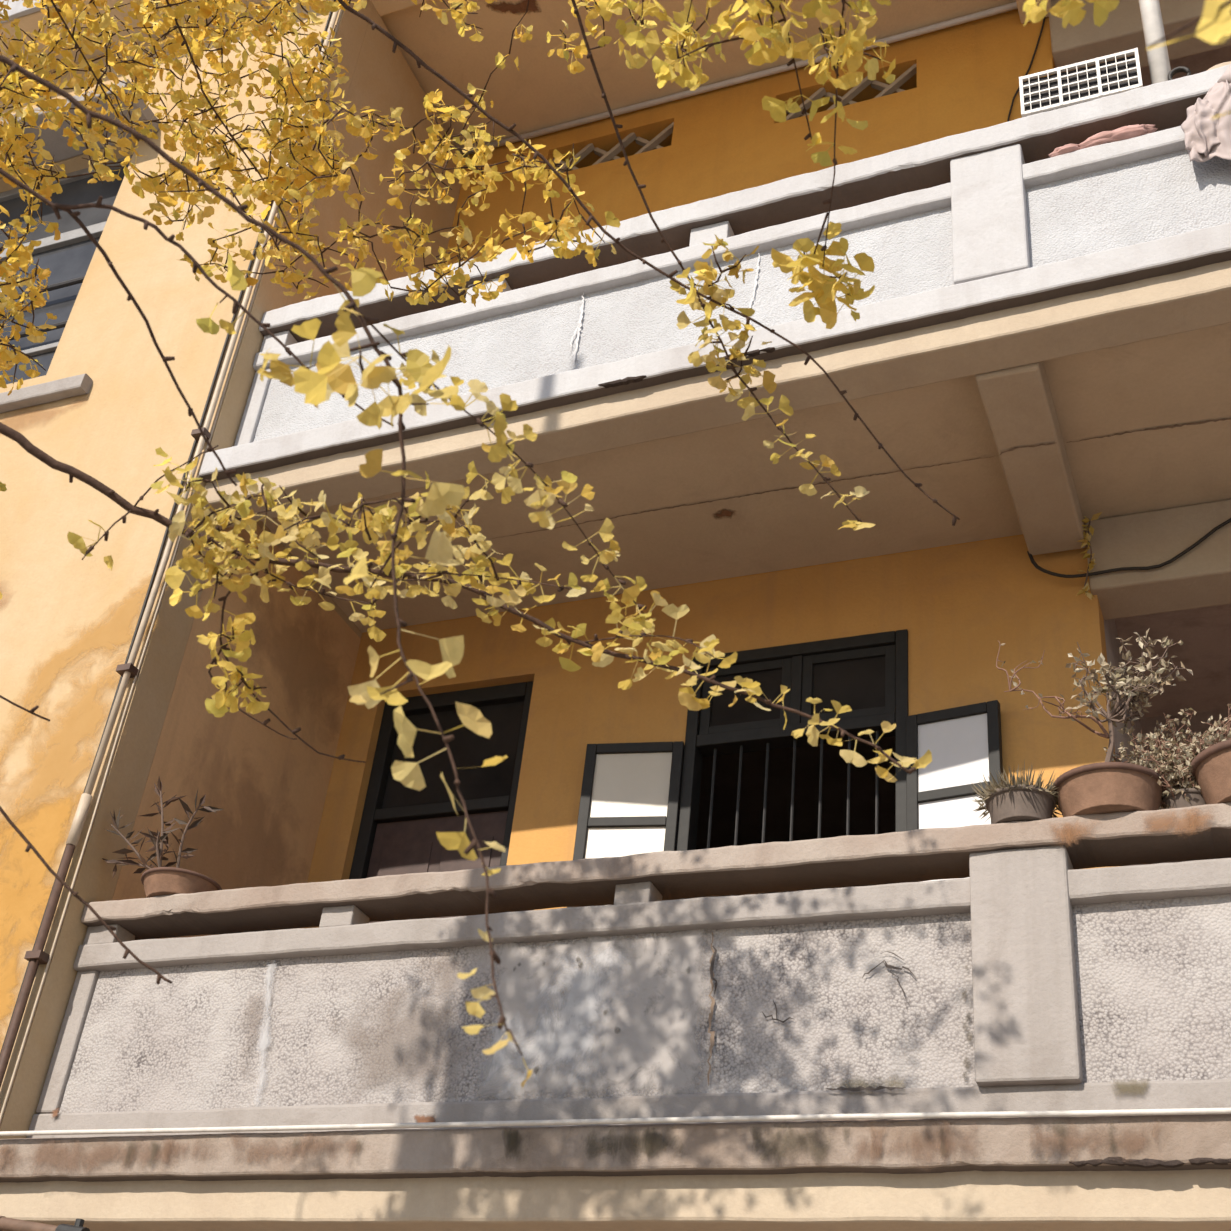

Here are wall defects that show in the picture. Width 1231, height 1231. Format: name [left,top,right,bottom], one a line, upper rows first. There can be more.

crack [493,419,1230,539]
crack [707,932,717,1086]
crack [862,951,915,1001]
leakage [587,1131,667,1155]